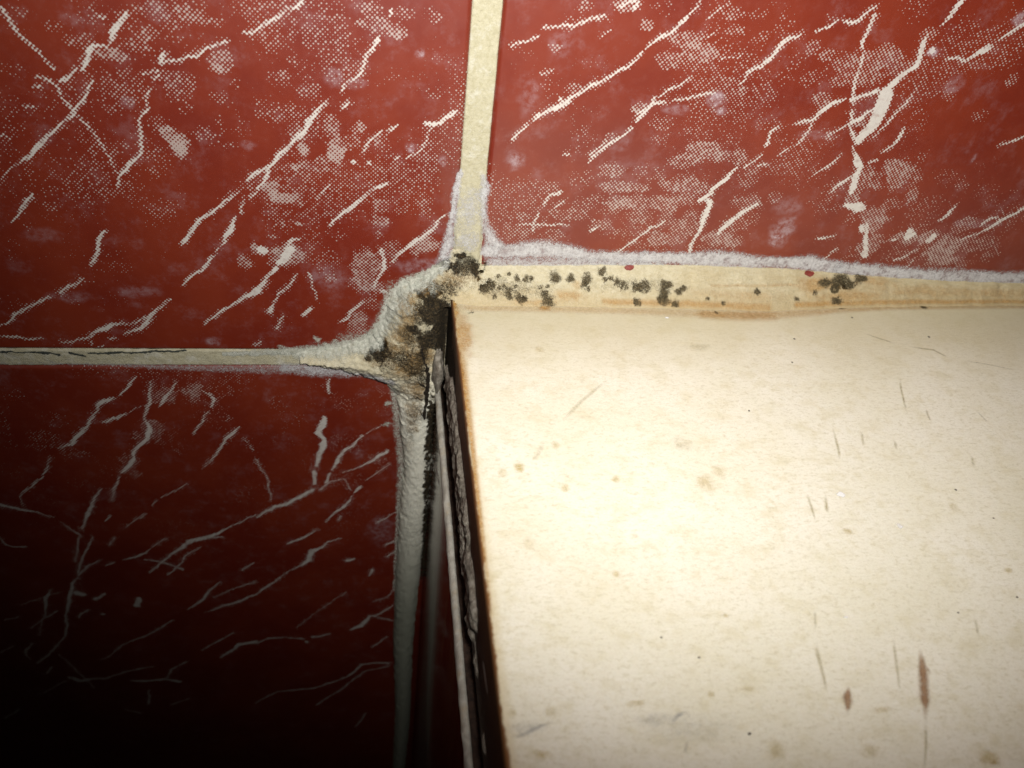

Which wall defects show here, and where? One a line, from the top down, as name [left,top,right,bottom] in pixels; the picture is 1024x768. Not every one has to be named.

water stain [365,252,687,585]
water stain [794,273,887,309]